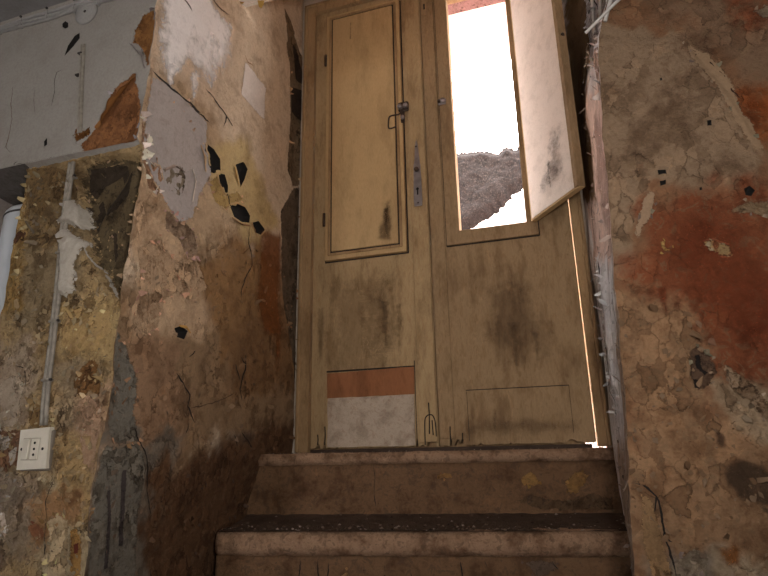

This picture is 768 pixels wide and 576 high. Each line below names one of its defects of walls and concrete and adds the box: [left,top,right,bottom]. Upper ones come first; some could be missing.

peeling [0,373,57,476]
spalling [12,7,245,576]
peeling [593,256,617,412]
peeling [684,339,768,426]